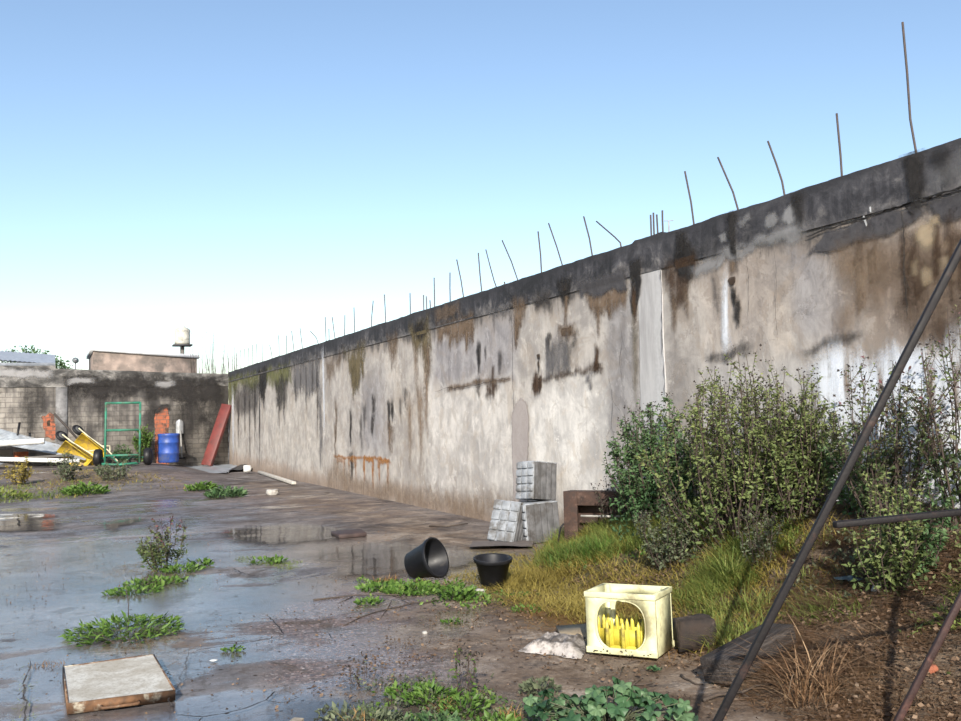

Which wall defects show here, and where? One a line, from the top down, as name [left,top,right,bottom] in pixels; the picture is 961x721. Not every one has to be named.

damp [64,345,364,465]
damp [349,396,375,442]
damp [404,313,509,445]
damp [489,258,641,345]
damp [532,344,599,395]
damp [665,230,696,327]
damp [710,280,746,362]
crack [807,186,961,317]
damp [809,150,961,302]
corrosion [335,455,389,481]
crack [18,659,31,721]
crack [167,615,367,721]